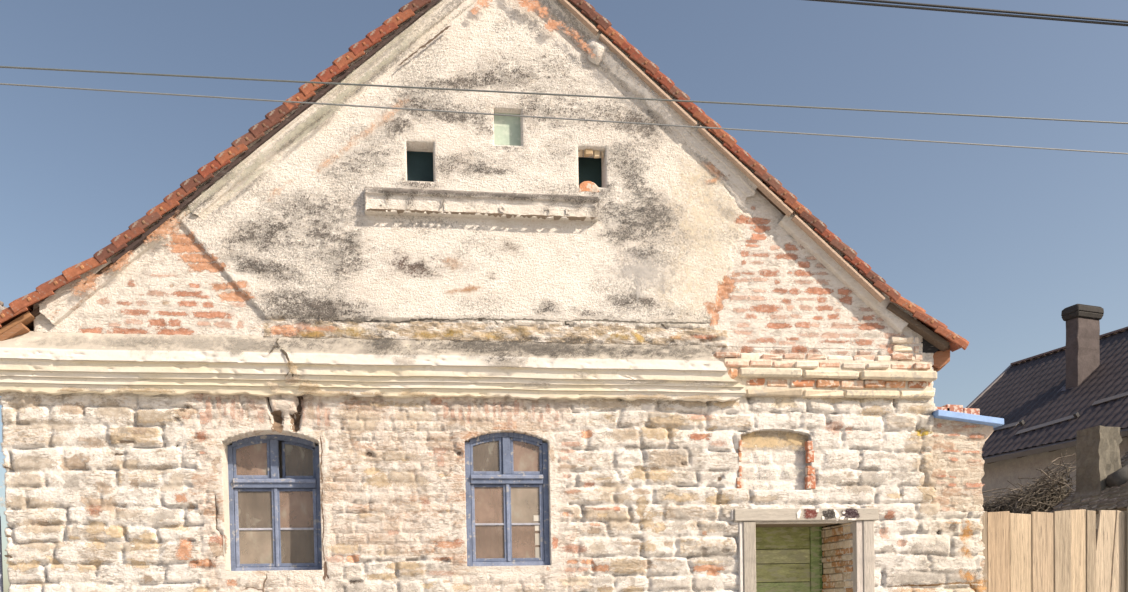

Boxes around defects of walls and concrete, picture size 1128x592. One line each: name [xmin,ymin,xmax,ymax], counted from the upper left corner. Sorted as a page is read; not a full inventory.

leakage [319,50,744,320]
spalling [71,211,255,335]
leakage [110,190,724,364]
spalling [671,206,905,355]
peeling [0,387,236,592]
crack [267,338,329,581]
peeling [257,361,496,435]
peeling [355,447,451,535]
peeling [350,539,471,591]
peeling [547,380,739,592]
peeling [748,495,782,503]
peeling [771,397,987,592]